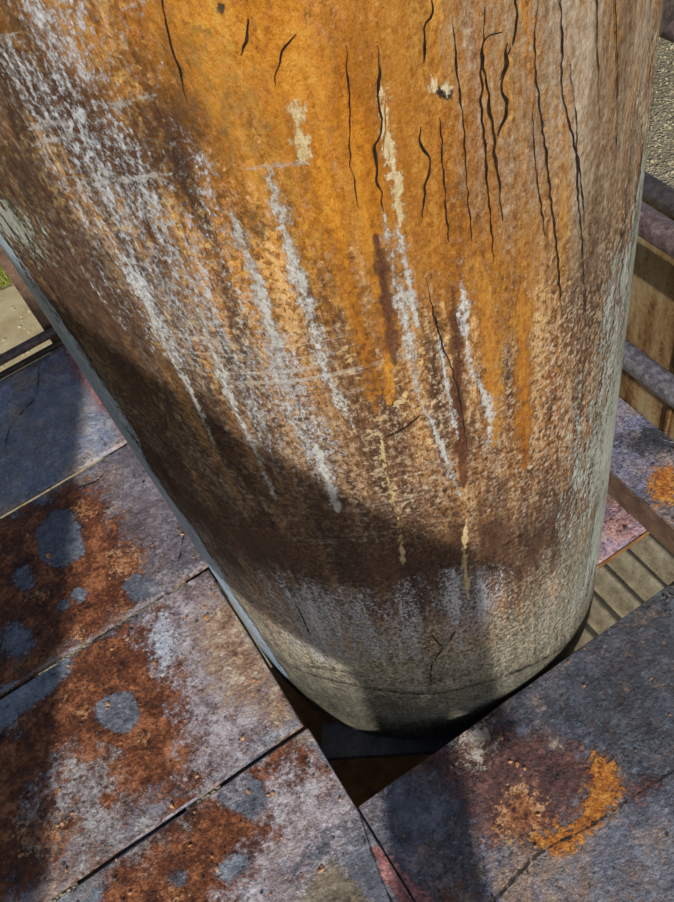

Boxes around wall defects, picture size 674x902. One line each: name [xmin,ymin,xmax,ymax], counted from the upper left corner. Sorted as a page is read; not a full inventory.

crack [346,46,387,211]
crack [418,0,587,326]
crack [596,0,618,171]
corrosion [0,0,576,620]
corrosion [647,464,674,510]
water stain [258,519,513,666]
corrosion [0,476,335,902]
water stain [135,561,586,804]
water stain [22,749,161,881]
water stain [213,748,387,902]
corrosion [409,711,663,860]
crack [492,773,673,902]